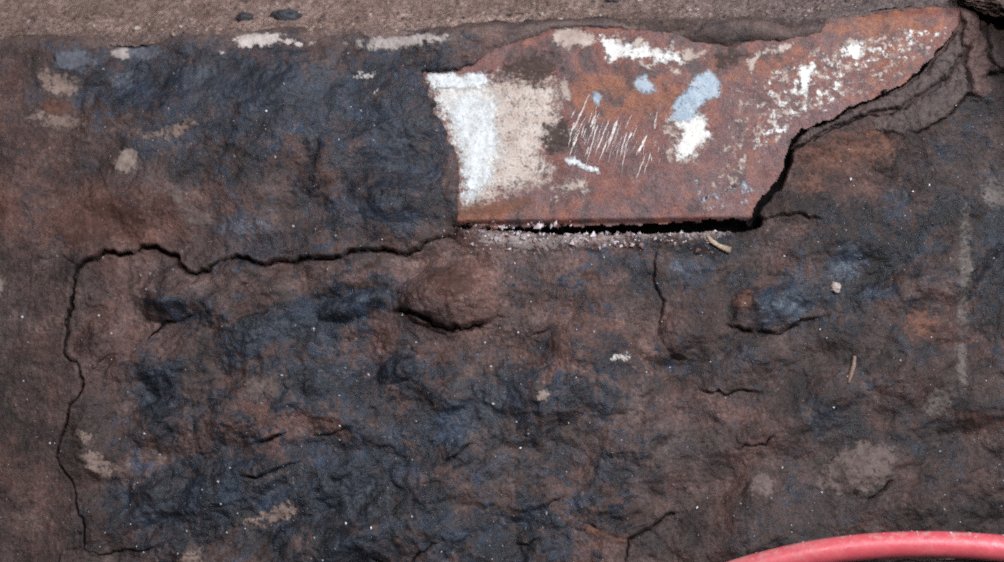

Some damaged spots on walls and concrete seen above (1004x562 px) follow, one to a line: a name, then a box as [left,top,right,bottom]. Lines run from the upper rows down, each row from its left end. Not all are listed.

peeling [422,6,961,229]
rust [784,8,1004,196]
crack [913,94,973,135]
crack [530,39,949,321]
crack [396,309,487,331]
crack [731,316,824,335]
crack [37,228,467,559]
crack [701,388,762,396]
crack [579,514,670,562]